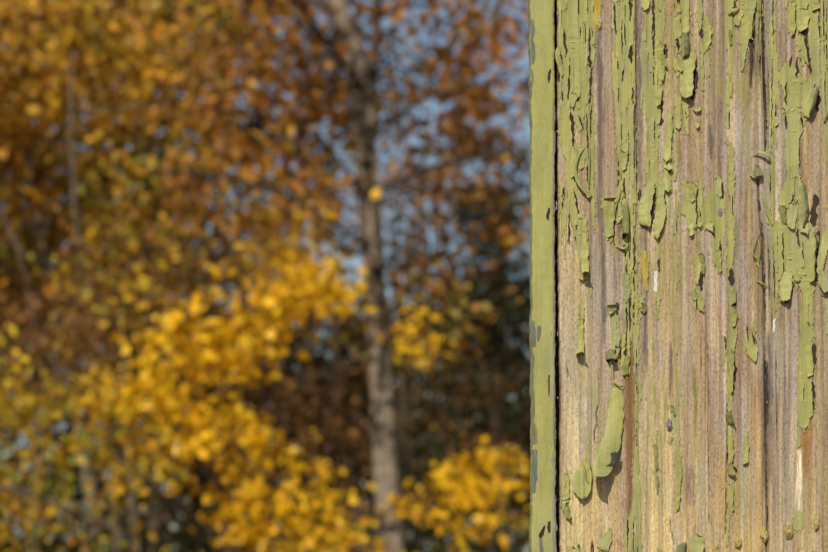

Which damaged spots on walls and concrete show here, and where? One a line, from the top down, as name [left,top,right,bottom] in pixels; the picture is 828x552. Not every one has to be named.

peeling [531,0,828,552]